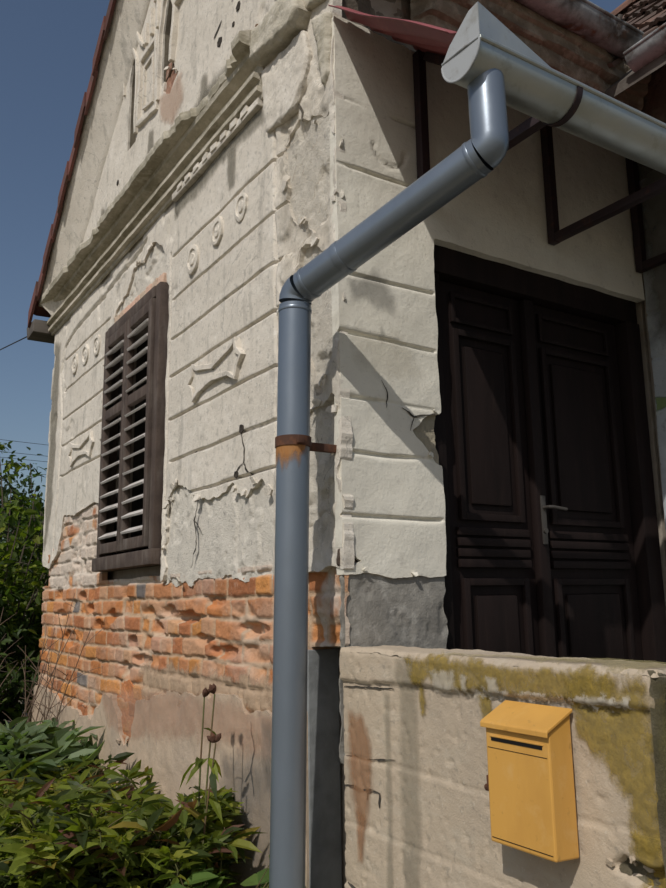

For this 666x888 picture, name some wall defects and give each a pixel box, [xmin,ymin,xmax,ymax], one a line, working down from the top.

damp [195,70,225,107]
crack [381,380,435,431]
crack [236,435,253,476]
corrosion [276,444,306,461]
spalling [413,409,439,465]
flaking render [38,477,275,744]
damp [433,671,630,709]
corrosion [349,715,370,860]